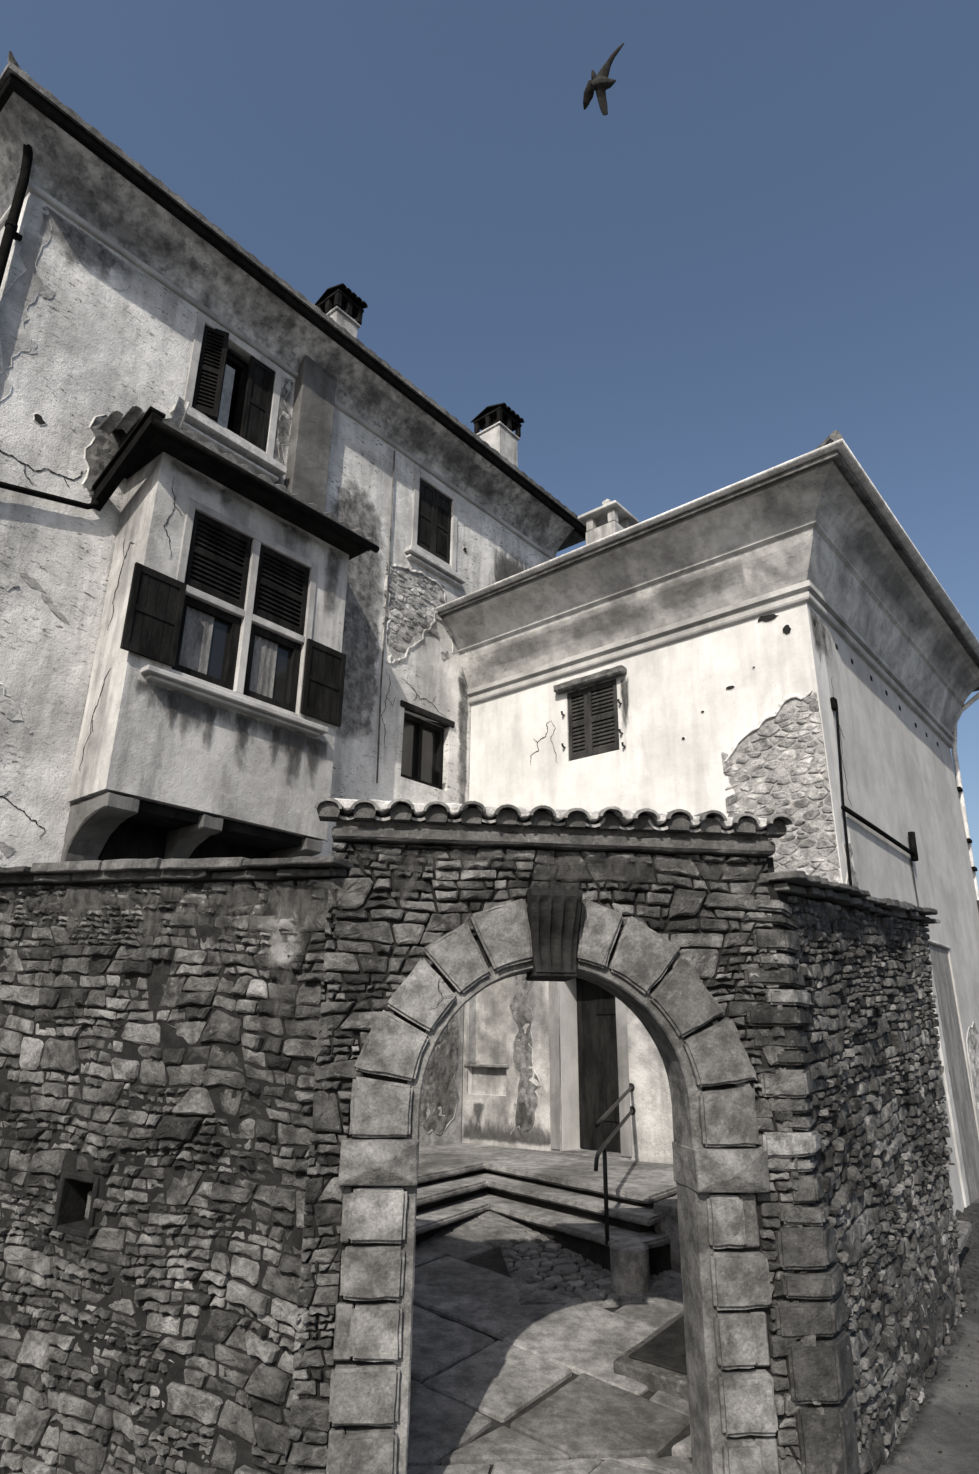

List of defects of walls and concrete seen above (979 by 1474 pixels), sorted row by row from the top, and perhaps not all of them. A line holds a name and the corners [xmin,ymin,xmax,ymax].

crack [0,450,87,488]
water stain [325,549,340,609]
flaking render [332,481,458,737]
water stain [136,680,327,780]
crack [530,721,557,765]
crack [0,791,45,837]
spalling [721,691,859,888]